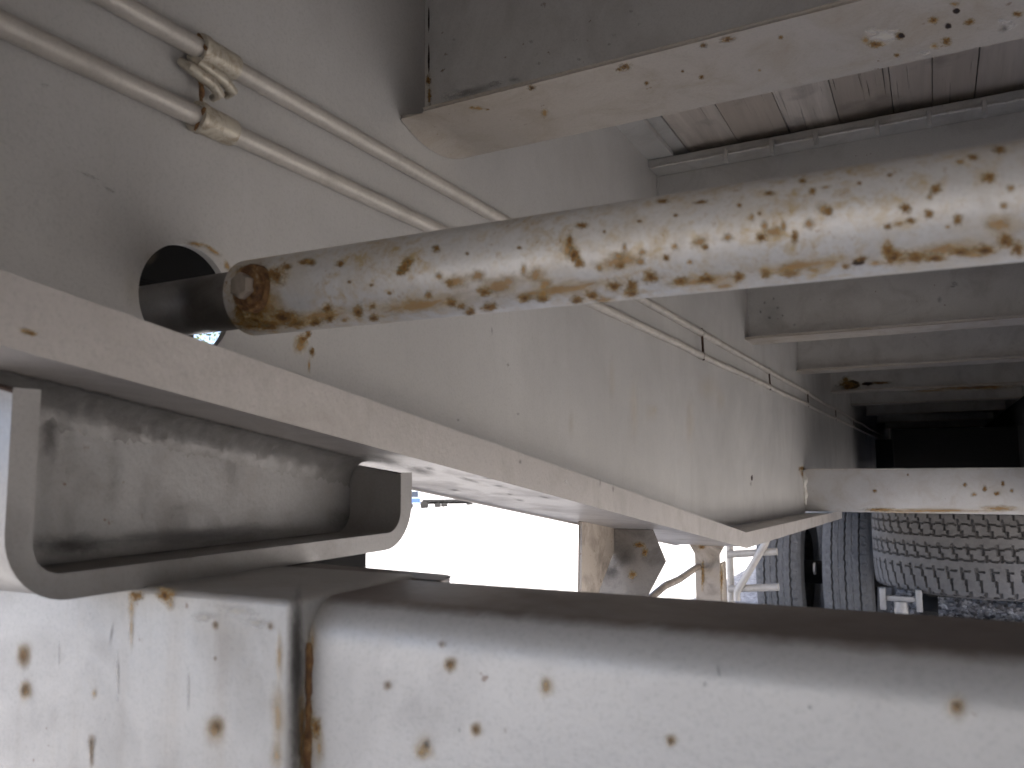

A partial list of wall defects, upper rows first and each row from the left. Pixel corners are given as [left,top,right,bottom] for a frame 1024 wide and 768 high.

rust [750,205,833,244]
rust [872,184,1023,265]
rust [564,223,587,268]
rust [390,245,658,316]
rust [673,271,745,288]
rust [761,260,832,279]
rust [232,258,379,369]
rust [839,377,888,390]
rust [963,481,1013,511]